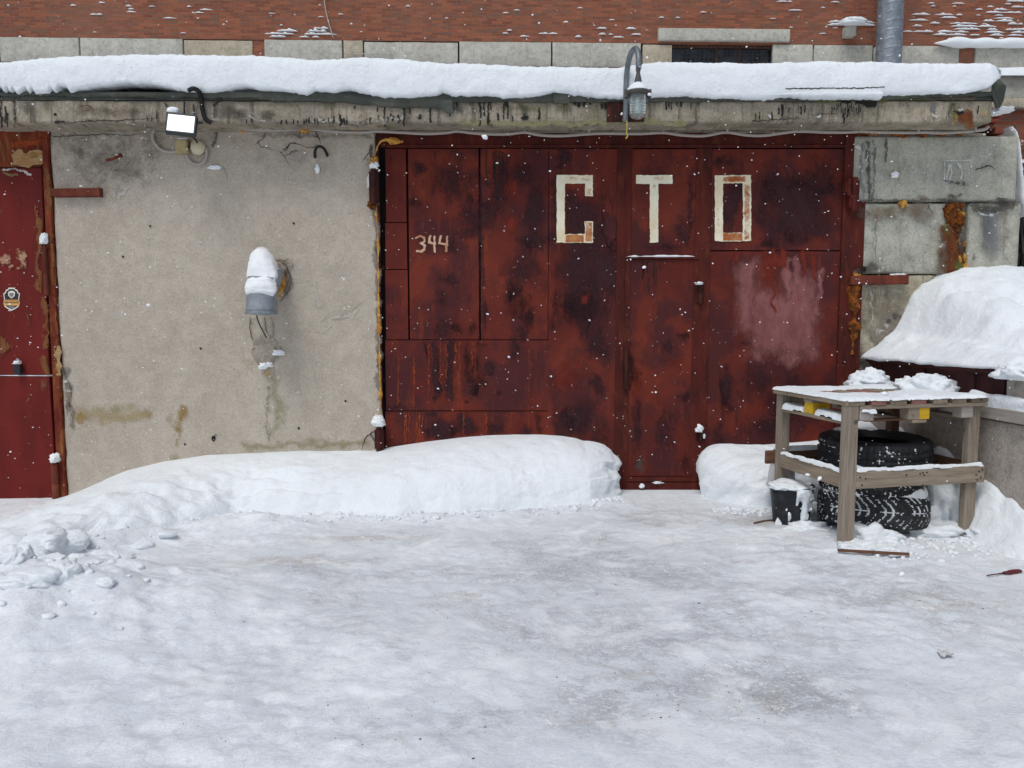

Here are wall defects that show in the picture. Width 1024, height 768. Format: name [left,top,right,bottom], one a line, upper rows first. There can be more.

leakage [369,107,432,127]
leakage [483,102,541,126]
peeling [0,133,74,427]
rust [439,149,616,355]
rust [718,163,835,285]
rust [938,199,965,274]
rust [397,302,540,445]